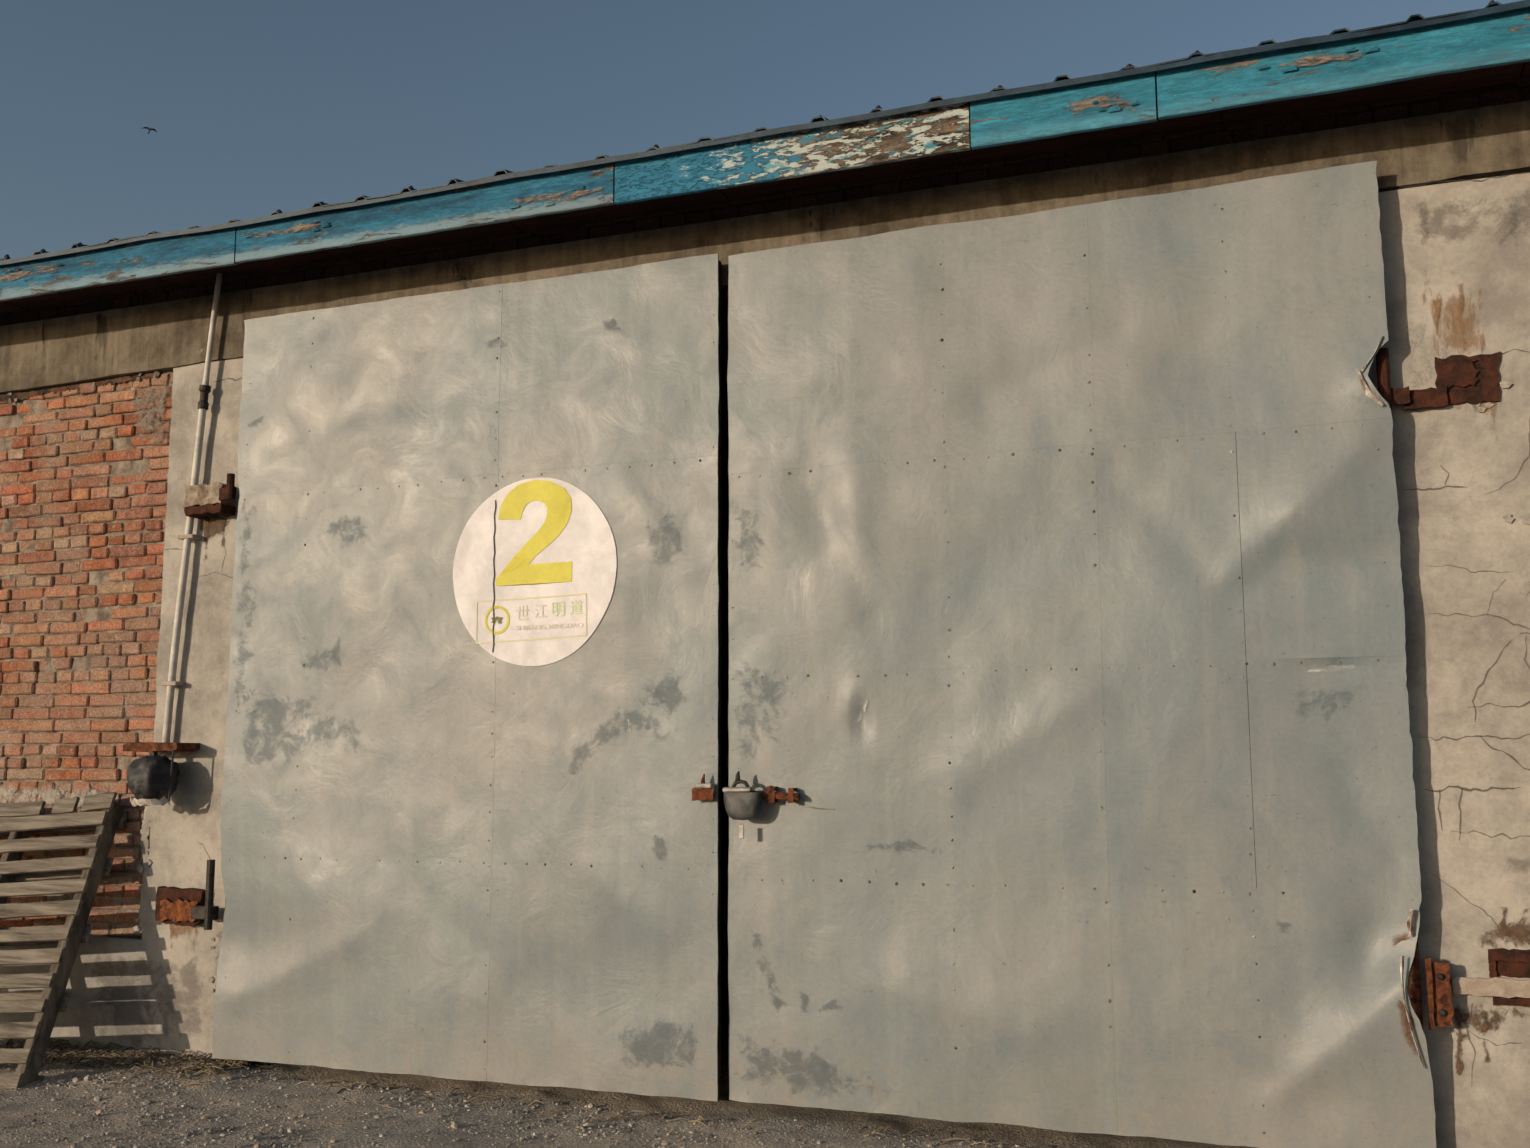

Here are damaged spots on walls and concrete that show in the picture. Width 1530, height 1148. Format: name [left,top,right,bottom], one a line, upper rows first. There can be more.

rust [1423,284,1483,354]
crack [1404,465,1464,491]
crack [1424,633,1530,840]
rust [1399,965,1416,1049]